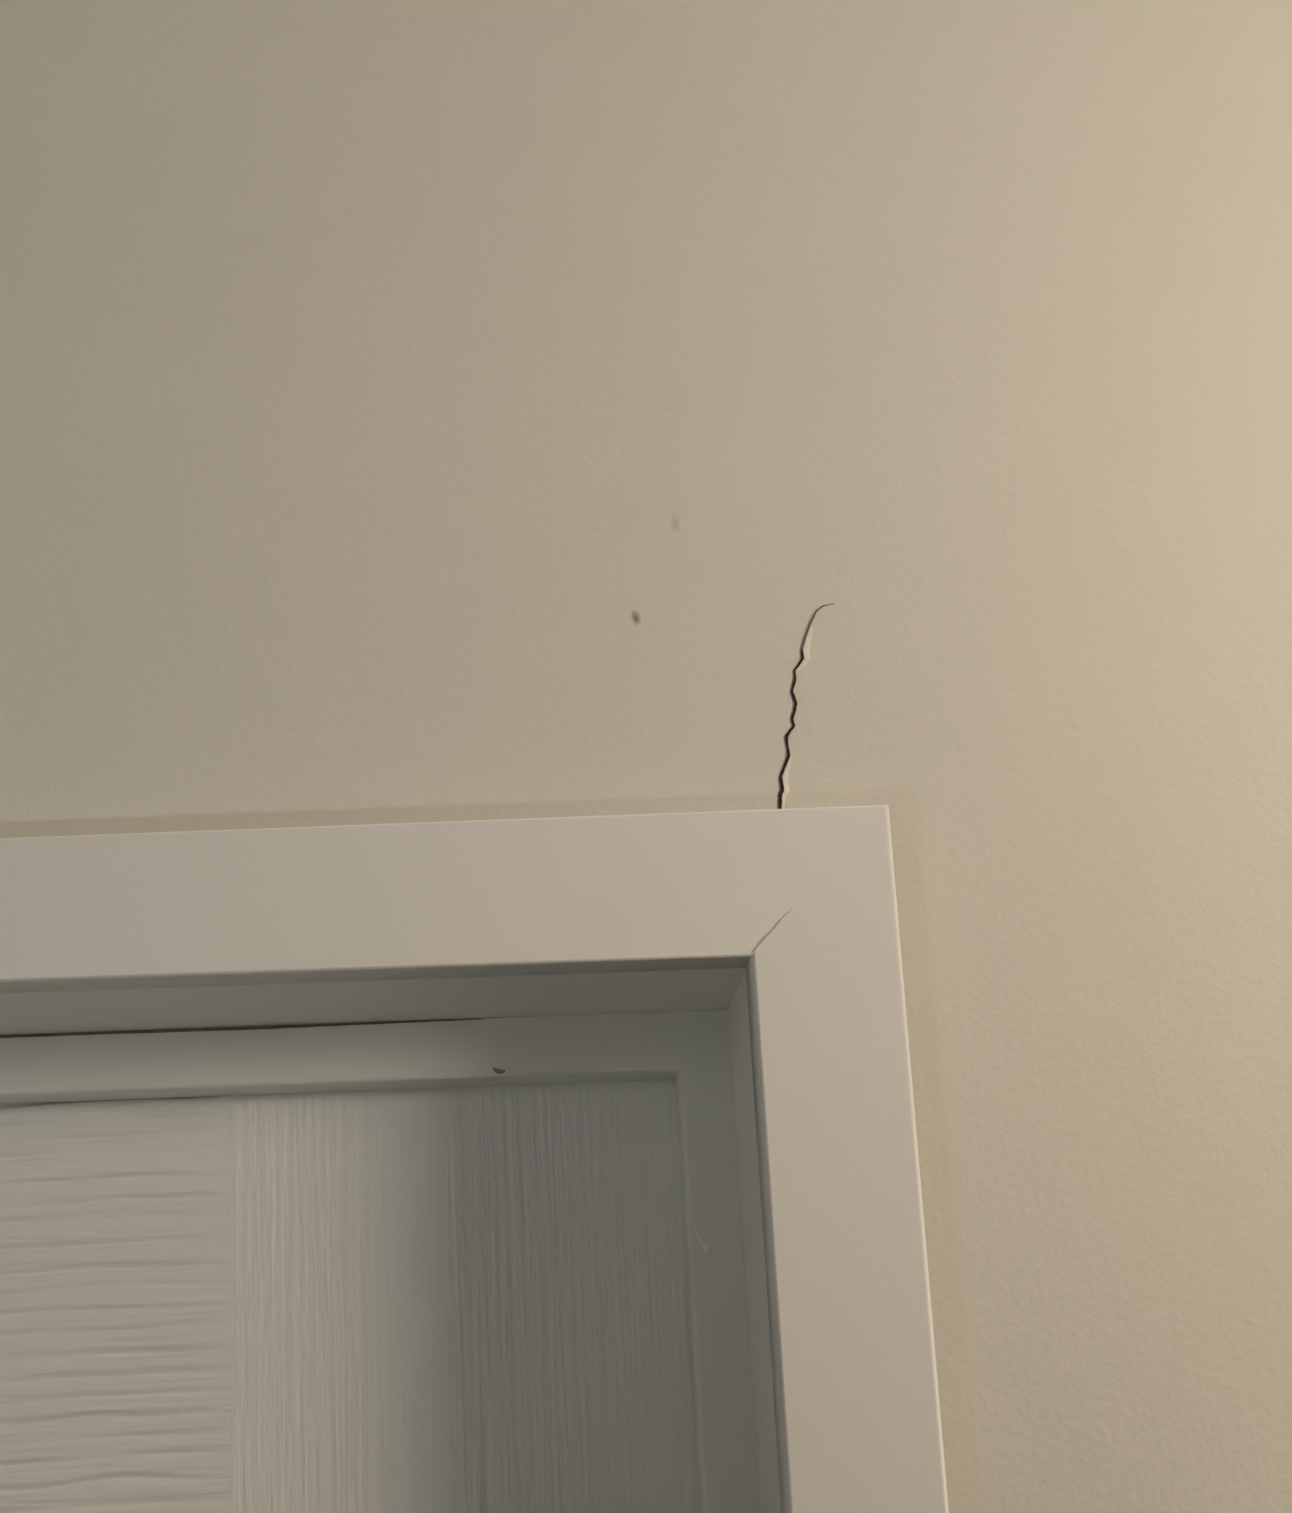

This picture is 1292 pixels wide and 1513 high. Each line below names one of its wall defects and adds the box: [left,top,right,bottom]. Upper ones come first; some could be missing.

crack [778,603,835,809]